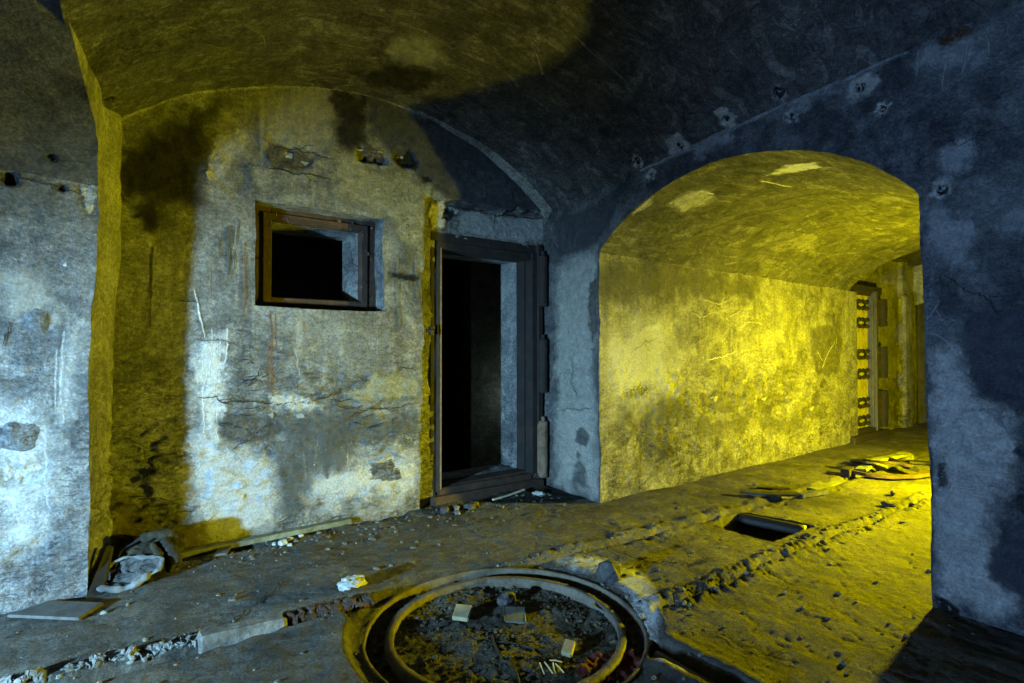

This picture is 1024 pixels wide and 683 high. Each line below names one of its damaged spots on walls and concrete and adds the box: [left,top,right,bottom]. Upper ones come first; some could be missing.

spalling [266,146,313,170]
crack [197,339,414,450]